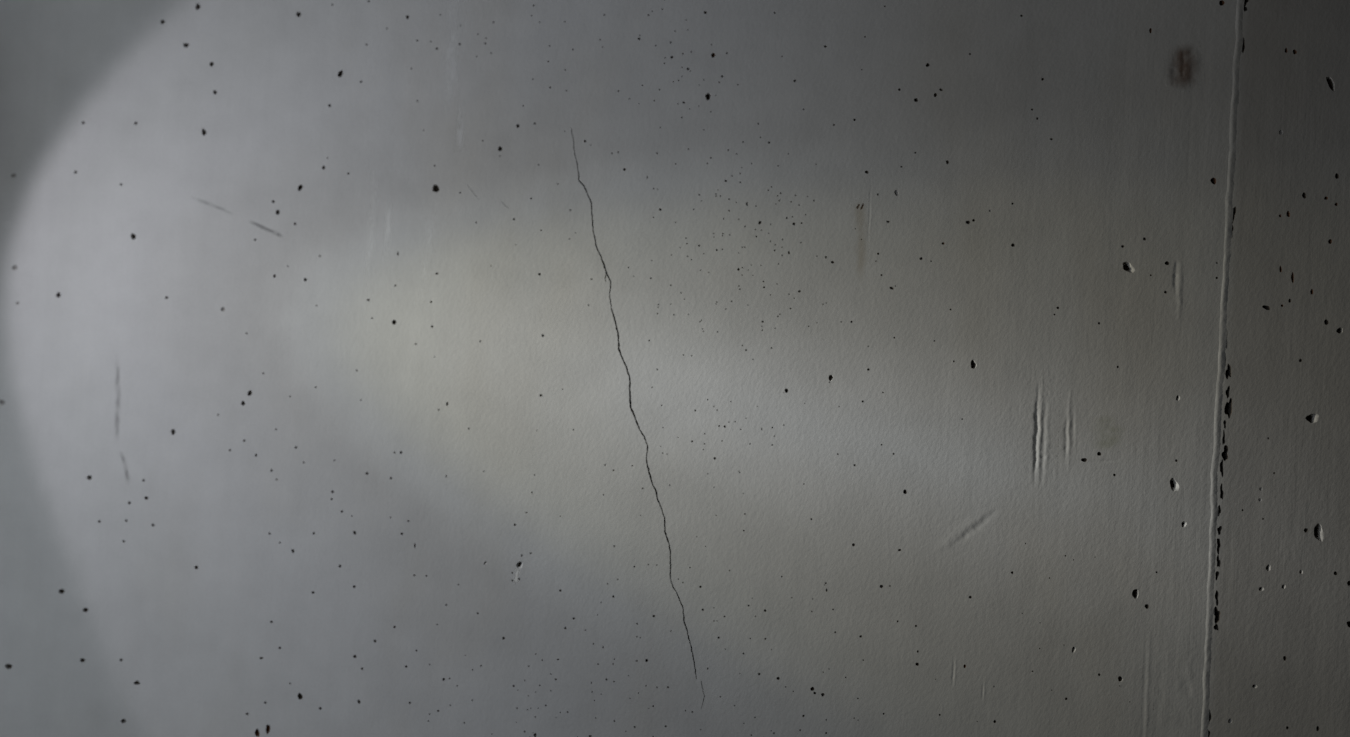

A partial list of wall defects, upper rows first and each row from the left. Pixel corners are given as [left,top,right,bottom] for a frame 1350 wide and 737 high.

crack [571,129,705,708]